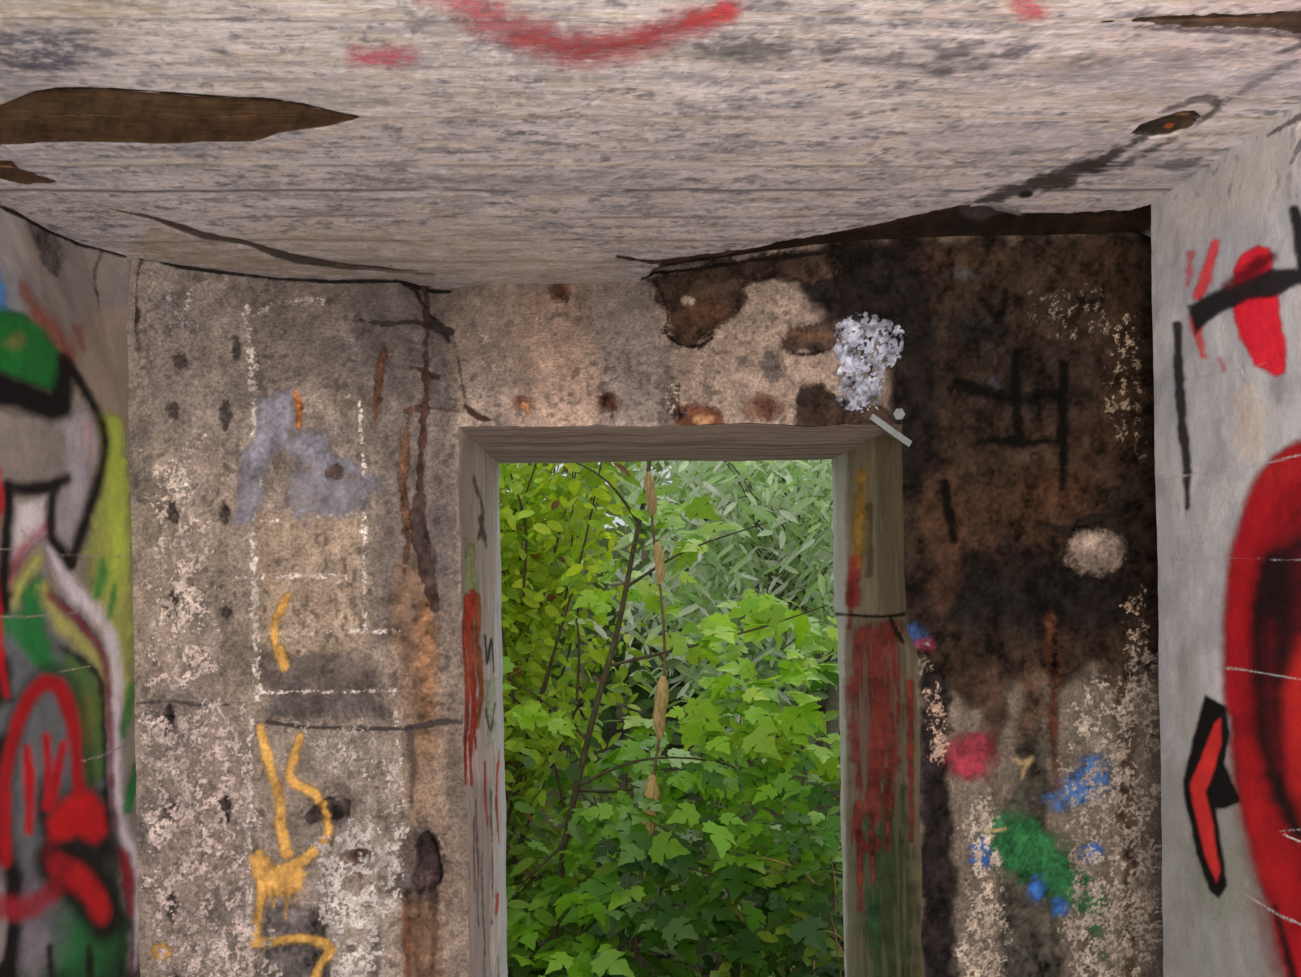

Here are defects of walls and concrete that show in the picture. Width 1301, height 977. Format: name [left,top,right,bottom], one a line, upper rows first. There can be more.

spalling [0,161,56,184]
spalling [28,222,65,277]
spalling [0,87,359,145]
crack [0,206,491,421]
rust [292,391,304,429]
rust [373,343,388,422]
spalling [616,202,1151,426]
peeling [1028,289,1147,460]
rust [395,285,459,737]
leakage [743,233,1159,977]
peeling [293,717,449,977]
rust [401,890,441,977]